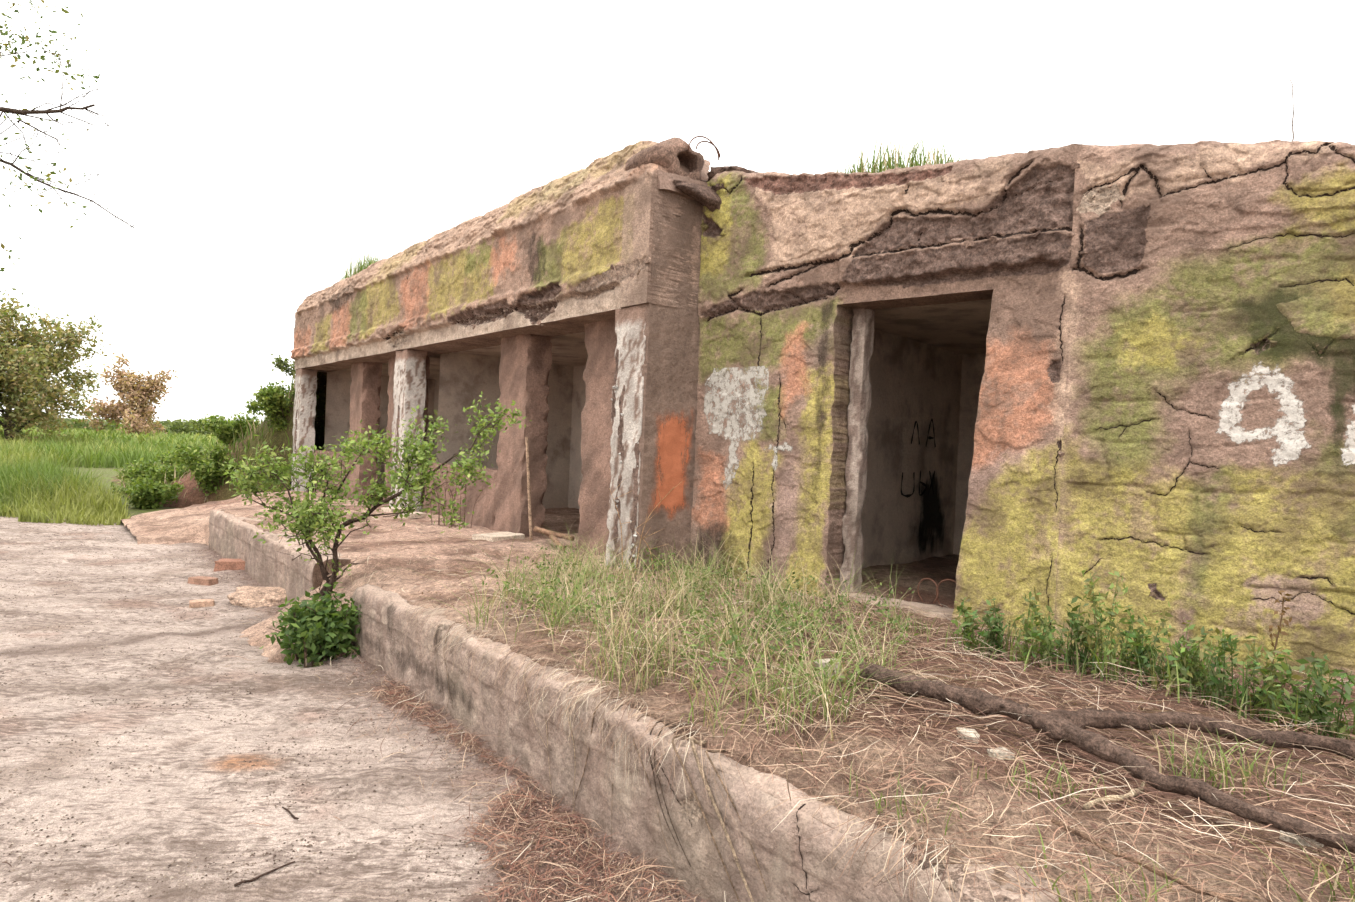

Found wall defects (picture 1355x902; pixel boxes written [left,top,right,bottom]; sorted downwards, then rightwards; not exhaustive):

crack [1084,142,1355,208]
spalling [447,256,651,329]
spalling [700,162,1151,317]
crack [1230,233,1355,248]
crack [1280,278,1354,288]
crack [707,161,1140,583]
leakage [1242,291,1355,440]
rust [653,416,691,516]
crack [1094,390,1220,496]
crack [1254,577,1355,615]